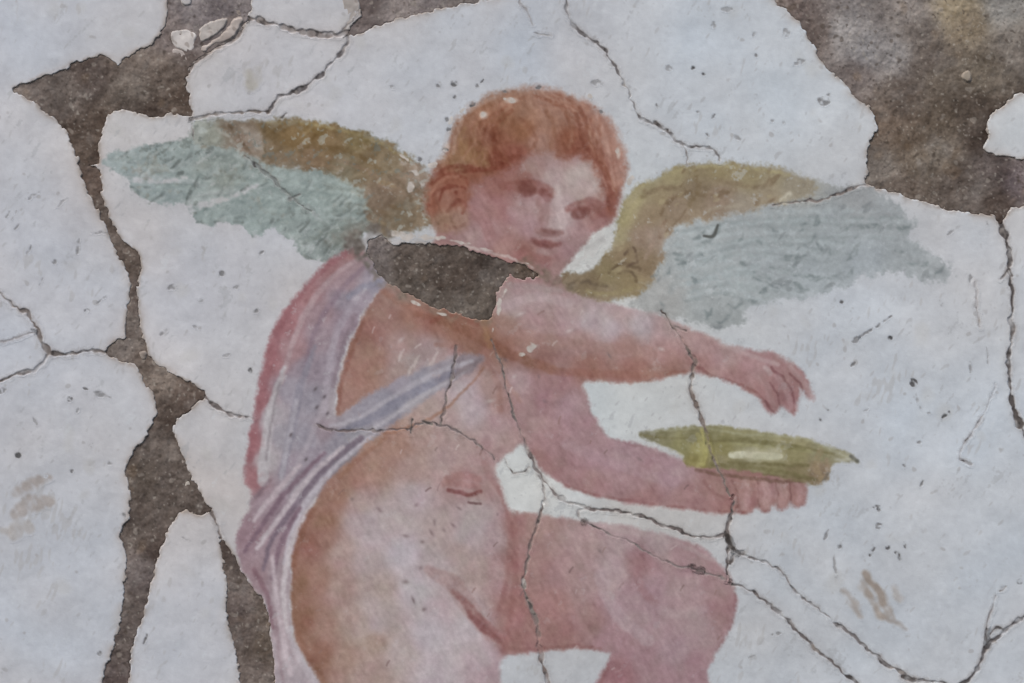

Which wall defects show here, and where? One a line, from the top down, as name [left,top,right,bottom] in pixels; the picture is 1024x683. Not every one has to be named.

crack [517,0,723,169]
spalling [775,0,1024,230]
crack [0,288,108,384]
spalling [320,219,614,333]
spalling [850,314,894,345]
crack [956,216,1024,469]
crack [312,307,1024,683]